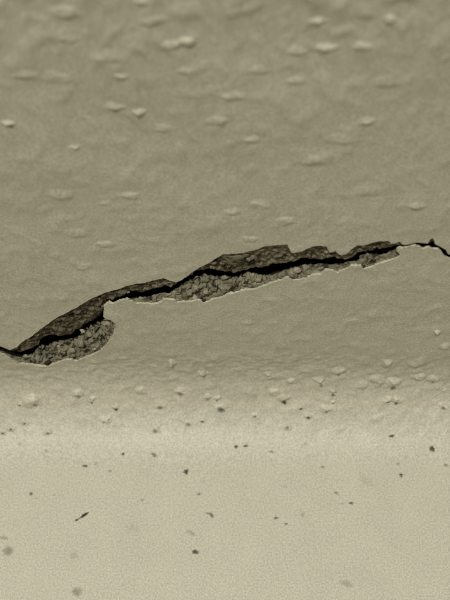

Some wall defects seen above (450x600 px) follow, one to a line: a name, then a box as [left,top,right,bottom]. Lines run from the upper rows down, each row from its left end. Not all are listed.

crack [0,238,450,362]